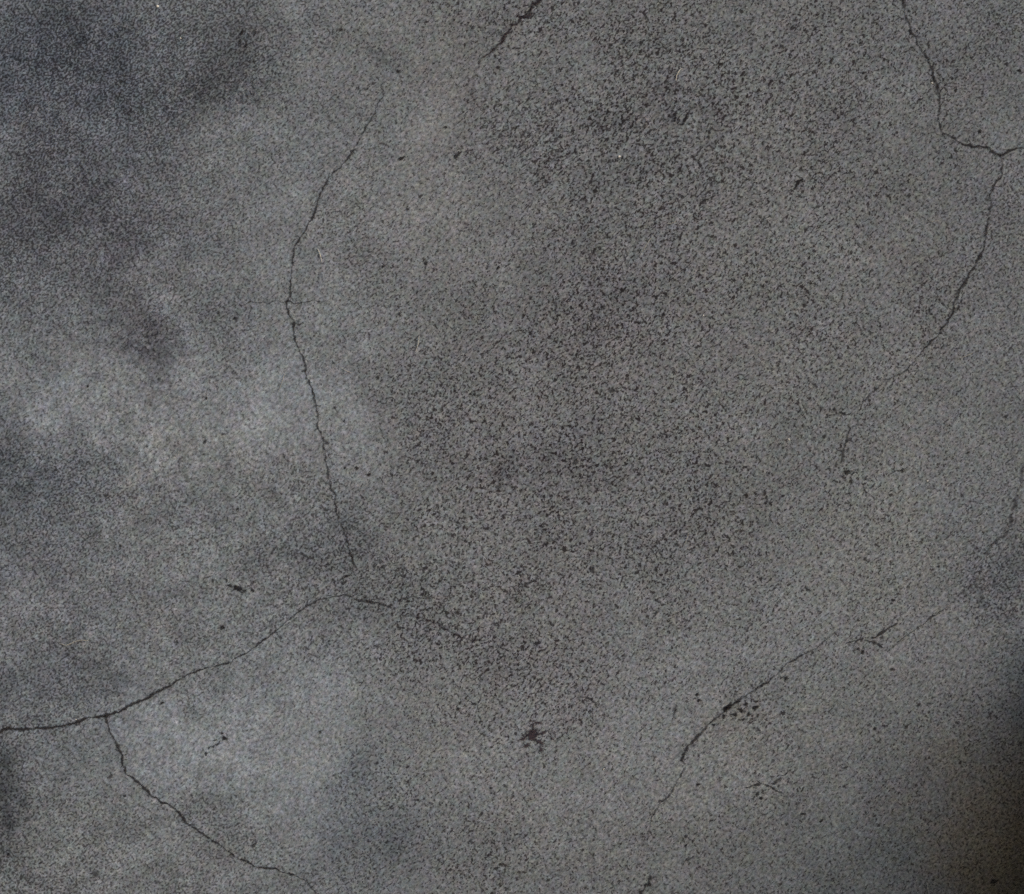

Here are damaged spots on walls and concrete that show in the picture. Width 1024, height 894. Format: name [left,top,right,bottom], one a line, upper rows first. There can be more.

crack [482,0,542,58]
crack [902,0,1023,372]
crack [0,93,390,892]
crack [648,610,943,837]